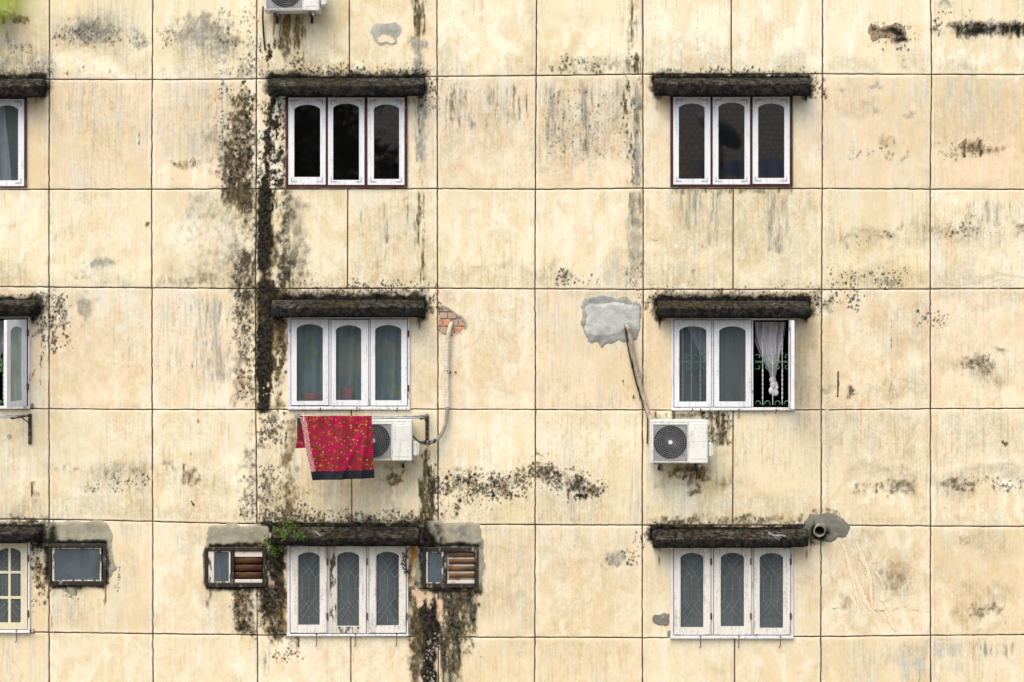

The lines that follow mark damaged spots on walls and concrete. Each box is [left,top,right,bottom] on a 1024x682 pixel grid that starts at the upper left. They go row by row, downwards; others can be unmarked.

water stain [54,21,121,45]
peeling [377,35,395,44]
spalling [868,22,909,46]
water stain [930,0,1024,38]
water stain [962,139,998,157]
water stain [173,14,326,523]
water stain [32,292,87,365]
flaking render [438,306,466,336]
water stain [418,449,605,524]
water stain [229,545,304,663]
water stain [408,581,481,682]